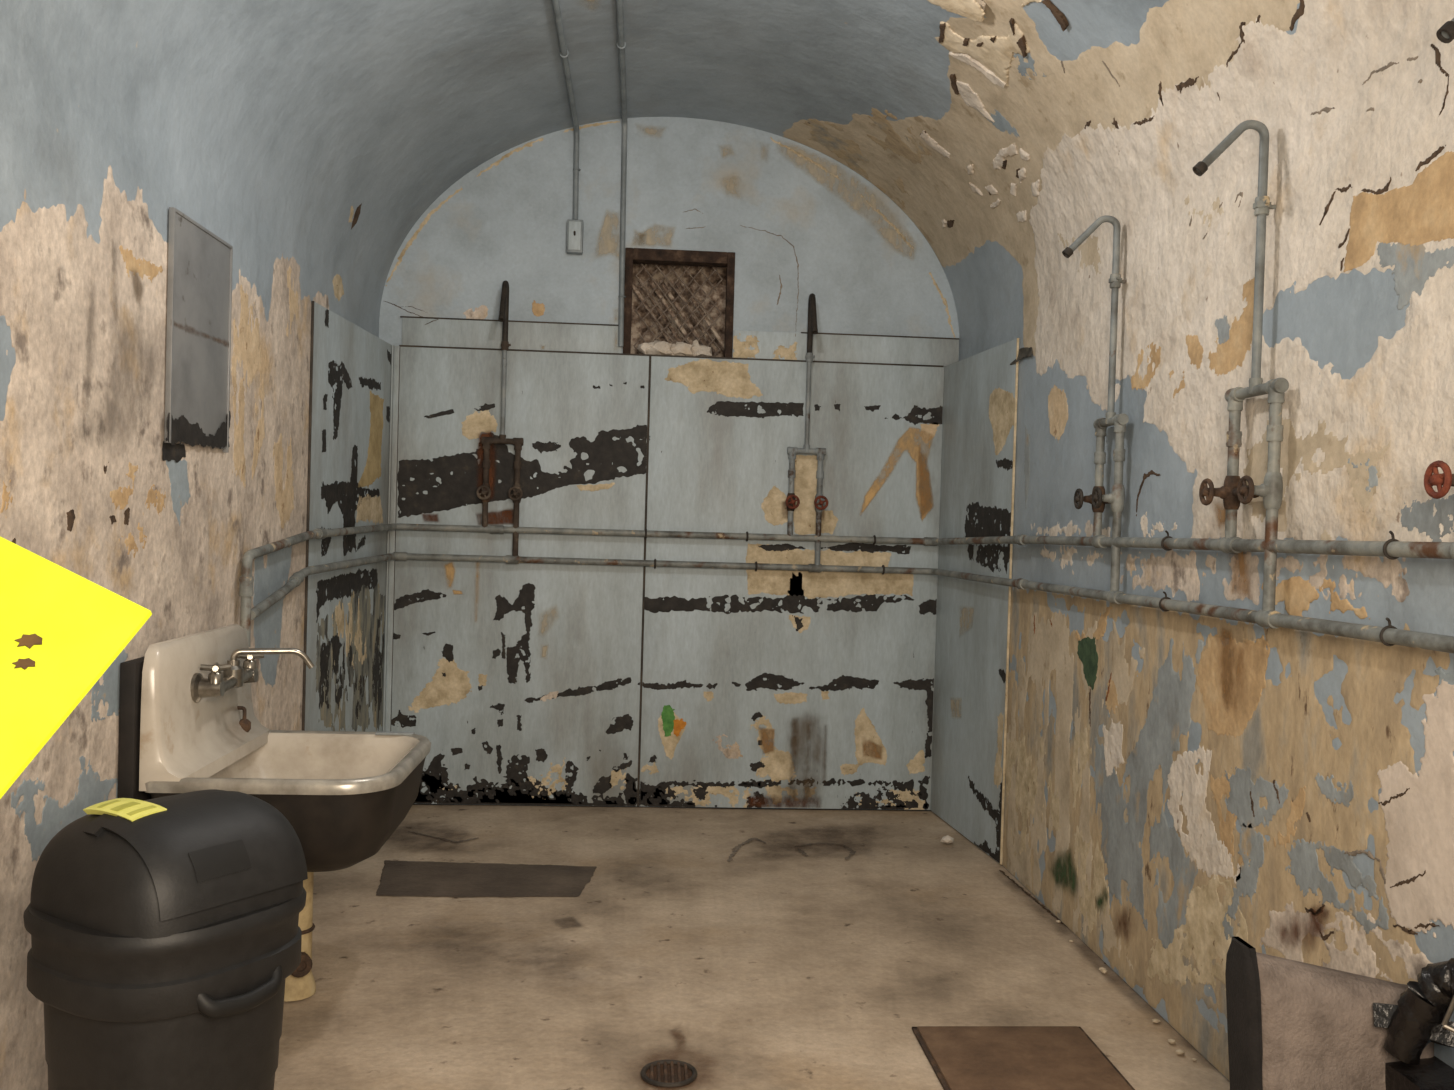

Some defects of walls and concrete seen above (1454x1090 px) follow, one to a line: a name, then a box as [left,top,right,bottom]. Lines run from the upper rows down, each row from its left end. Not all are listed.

spalling [385,138,543,286]
peeling [0,166,943,1090]
corrosion [477,510,513,524]
peeling [770,0,1454,1081]